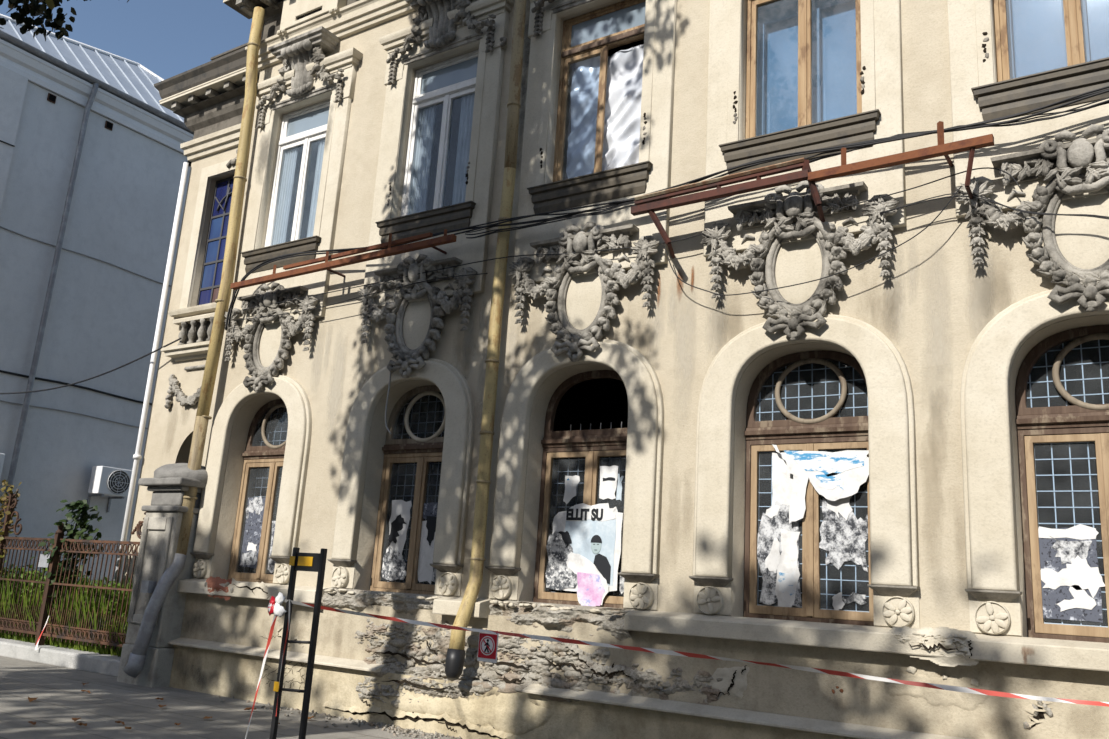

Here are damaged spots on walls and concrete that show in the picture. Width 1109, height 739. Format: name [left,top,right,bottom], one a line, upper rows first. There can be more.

flaking render [204,576,234,601]
spalling [490,600,576,611]
crack [231,578,525,739]
spalling [354,618,723,713]
flaking render [884,626,990,711]